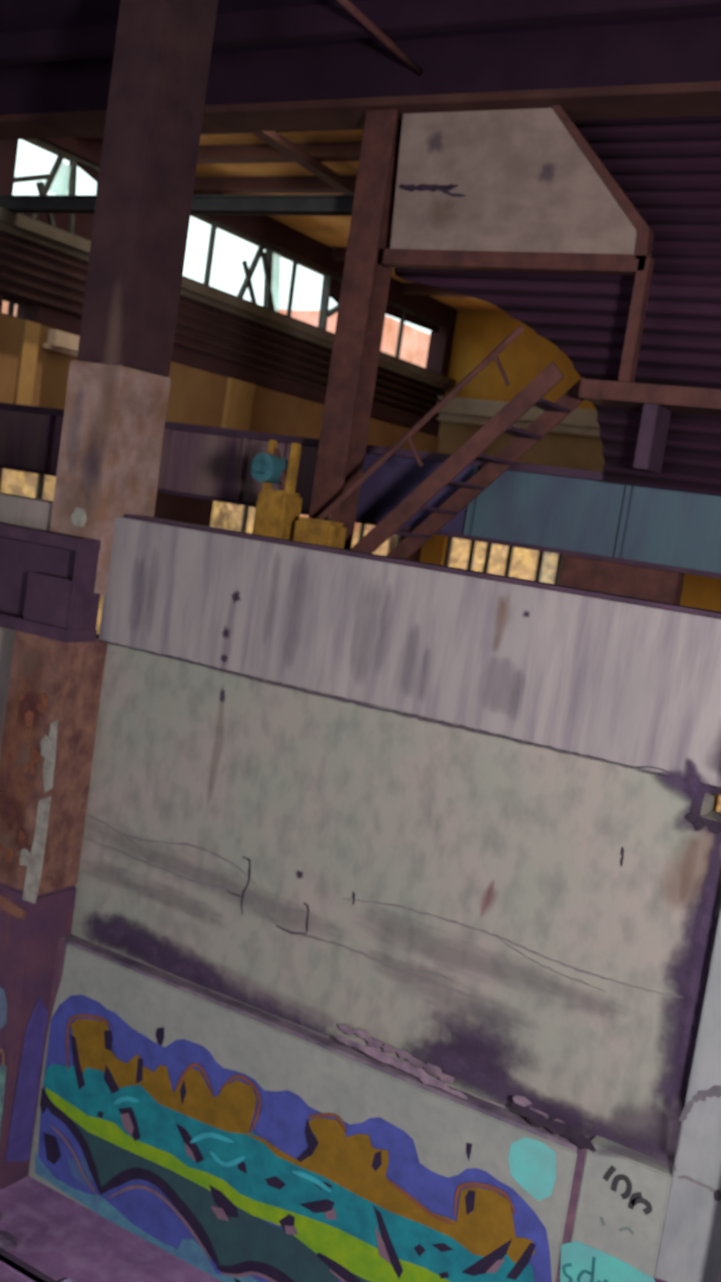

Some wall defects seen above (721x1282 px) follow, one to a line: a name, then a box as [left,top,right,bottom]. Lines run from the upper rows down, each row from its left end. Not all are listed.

peeling [20,720,58,904]
water stain [411,1045,557,1120]